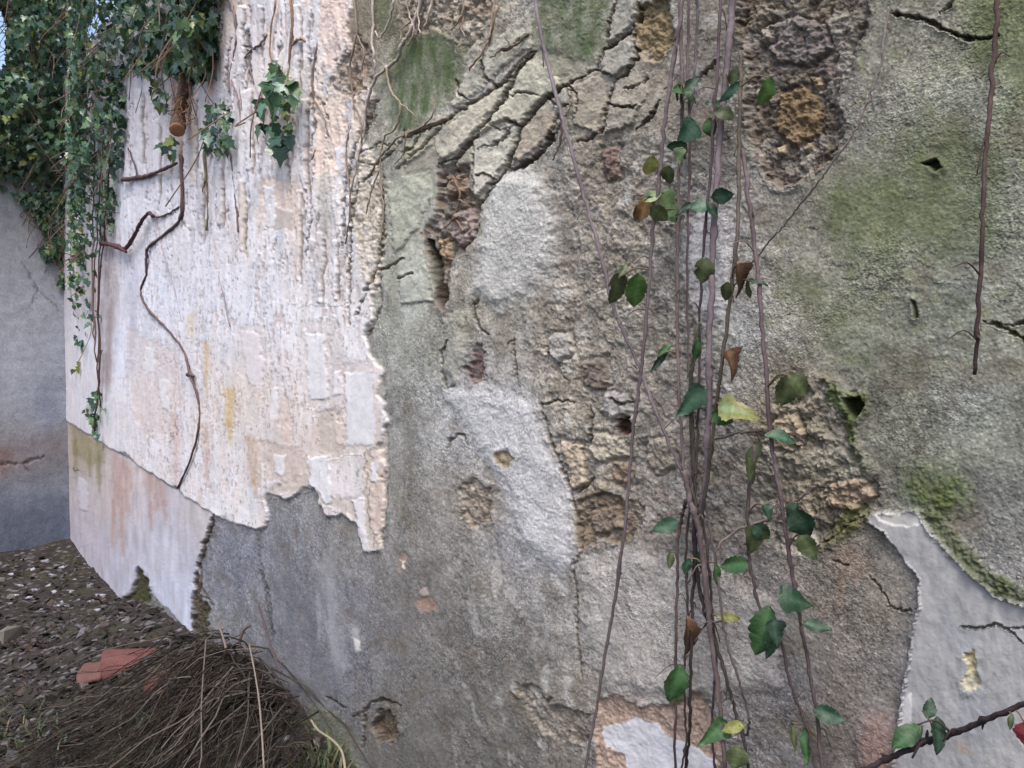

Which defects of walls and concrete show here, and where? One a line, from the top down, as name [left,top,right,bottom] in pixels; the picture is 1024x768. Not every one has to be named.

crack [889,0,1000,42]
crack [695,56,722,81]
spalling [734,0,872,193]
crack [340,0,659,340]
spalling [923,158,943,172]
spalling [122,0,713,560]
spalling [712,314,741,411]
flaking render [697,372,1024,737]
crack [963,622,1024,643]
spalling [368,706,401,747]
spalling [512,680,723,768]
flaking render [897,707,1024,768]